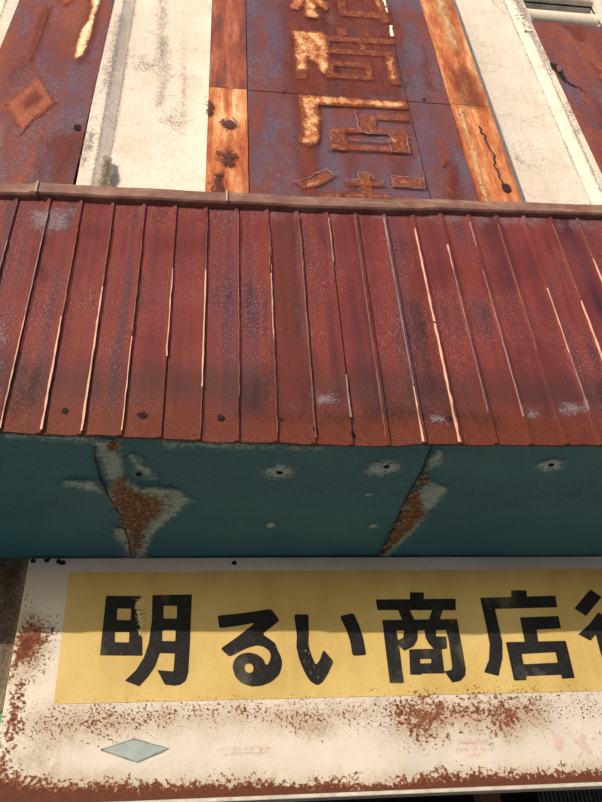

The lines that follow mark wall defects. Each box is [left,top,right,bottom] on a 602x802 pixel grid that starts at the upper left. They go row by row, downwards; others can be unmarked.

rust [75,0,100,62]